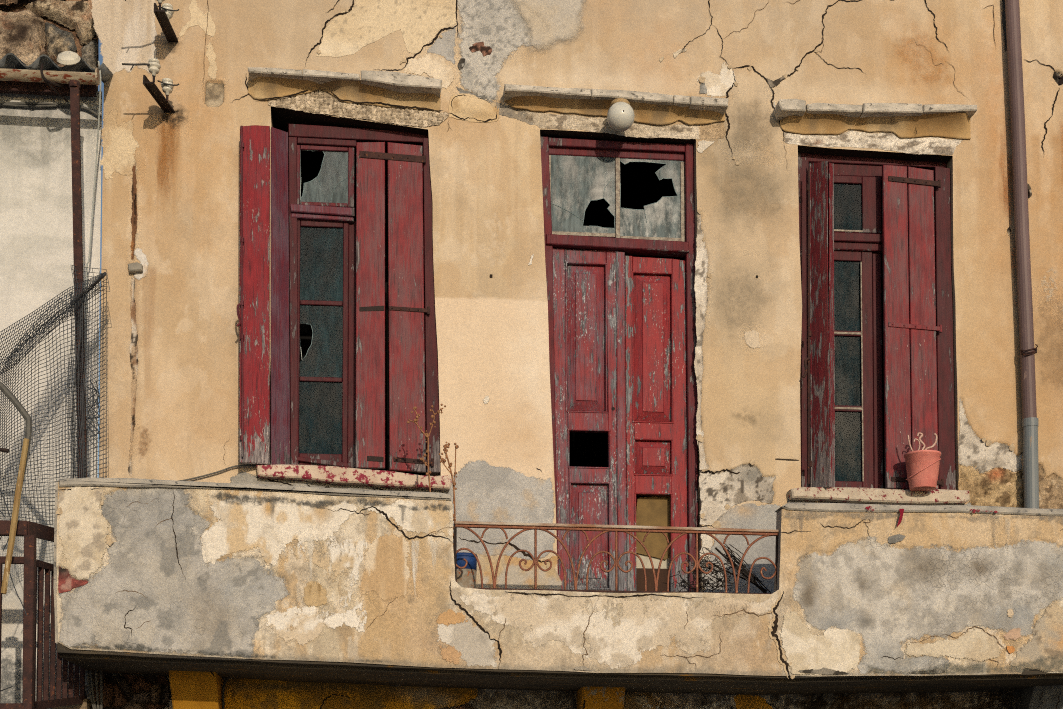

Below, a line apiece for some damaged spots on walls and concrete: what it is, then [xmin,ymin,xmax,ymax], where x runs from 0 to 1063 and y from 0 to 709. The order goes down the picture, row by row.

crack [233,77,497,130]
crack [374,0,458,71]
peeling [316,0,537,125]
crack [676,0,867,165]
flaking render [694,209,776,560]
flaking render [958,398,1022,474]
peeling [56,486,114,594]
peeling [201,495,452,646]
crack [256,477,551,568]
crack [449,582,506,667]
crack [505,591,795,679]
peeling [459,552,861,675]